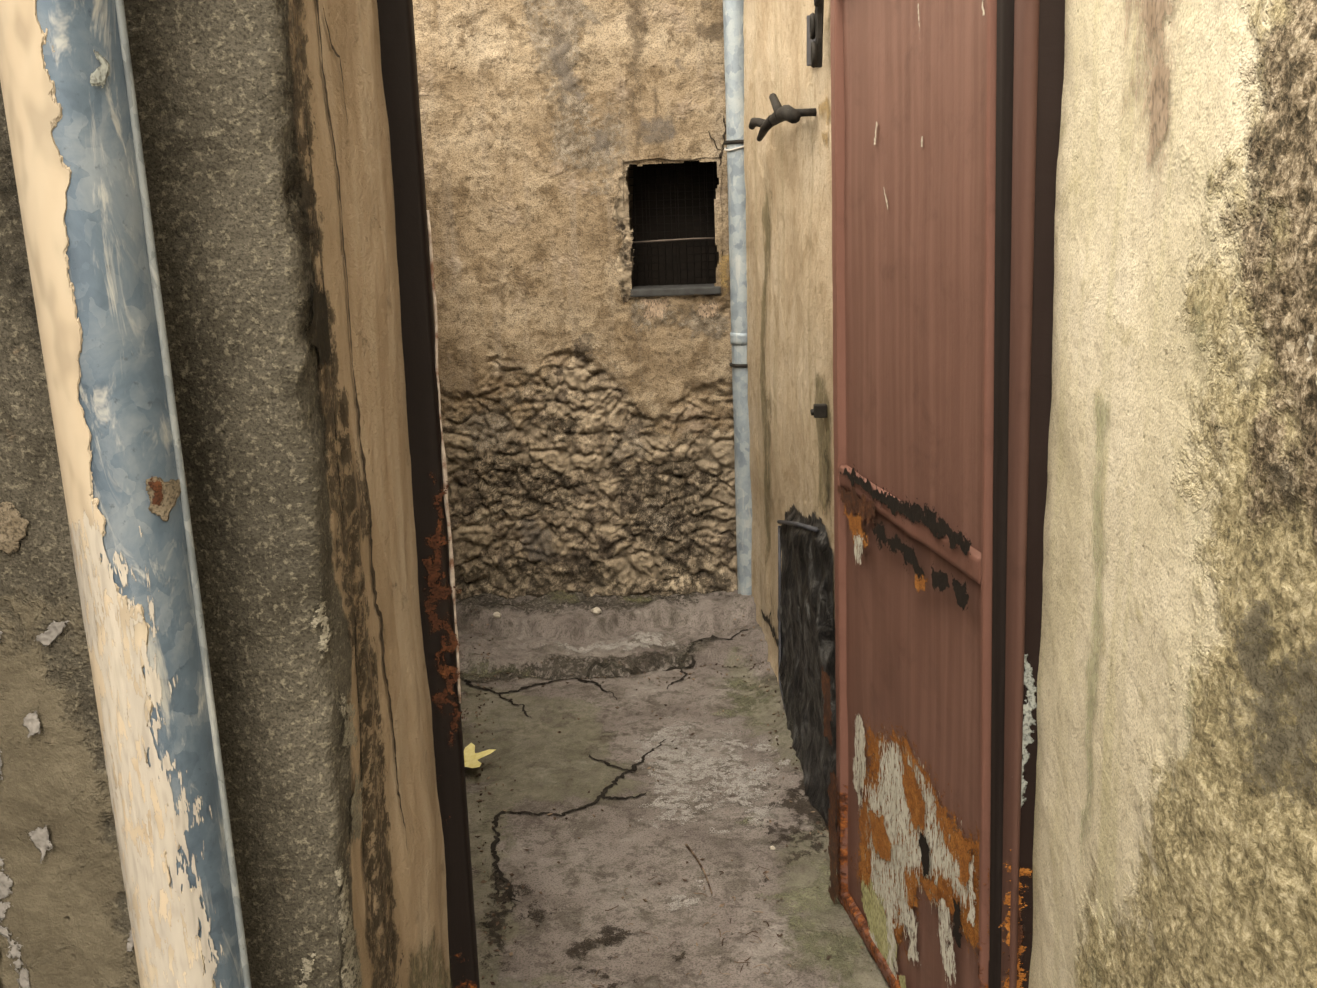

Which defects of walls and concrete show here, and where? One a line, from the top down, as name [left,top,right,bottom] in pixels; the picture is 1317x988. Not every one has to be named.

water stain [0,107,41,349]
water stain [1304,335,1317,385]
peeling [0,501,29,554]
corrosion [837,464,972,562]
water stain [1264,451,1302,531]
peeling [34,620,69,647]
corrosion [422,472,469,746]
crack [460,590,778,717]
peeling [29,825,53,865]
crack [490,739,667,906]
corrosion [827,717,1033,988]
peeling [0,858,30,988]